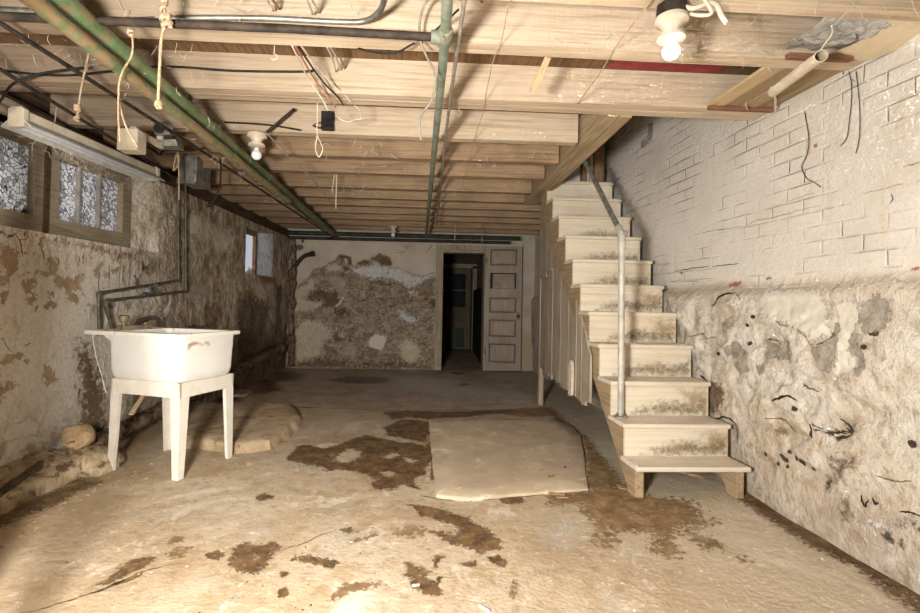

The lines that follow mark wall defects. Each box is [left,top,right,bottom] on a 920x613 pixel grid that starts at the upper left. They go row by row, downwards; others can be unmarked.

peeling [0,352,30,402]
peeling [42,362,60,388]
peeling [0,231,119,312]
water stain [188,301,224,329]
water stain [235,280,289,356]
flaking render [294,253,436,366]
water stain [270,357,520,491]
peeling [717,285,840,375]
crack [765,384,819,432]
spalling [849,293,892,377]